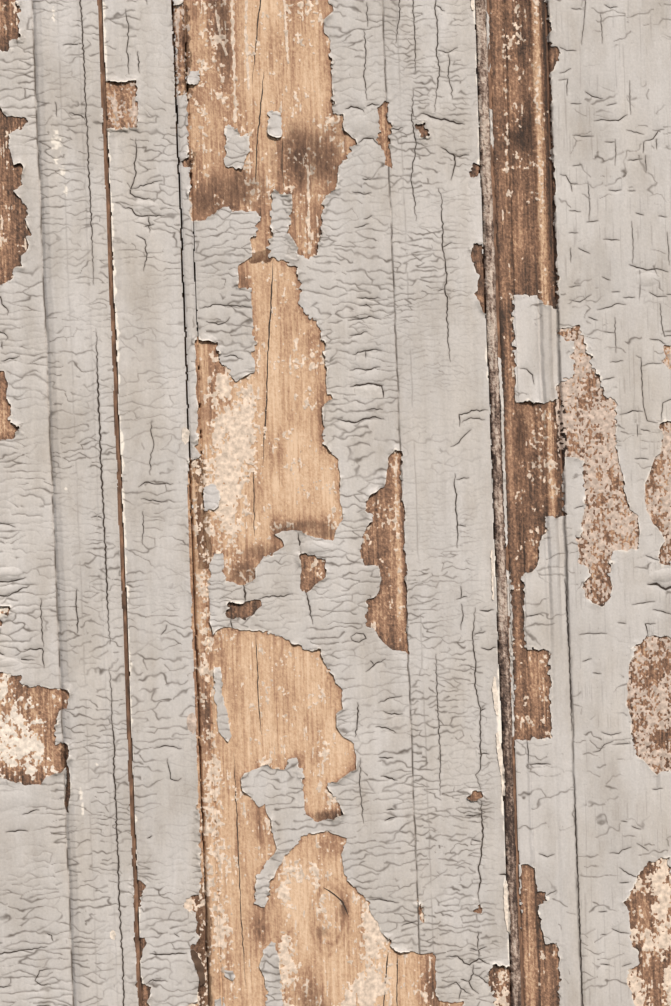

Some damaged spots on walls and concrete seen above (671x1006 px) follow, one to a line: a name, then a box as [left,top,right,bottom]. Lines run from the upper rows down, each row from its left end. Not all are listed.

peeling [0,108,32,285]
crack [360,0,463,219]
peeling [471,0,671,741]
crack [94,335,110,637]
peeling [171,0,464,1006]
peeling [0,672,70,812]
crack [110,675,125,1006]
crack [459,590,509,898]
crack [541,780,628,1006]
crack [565,556,671,722]
peeling [623,857,671,1006]
peeling [626,635,671,774]